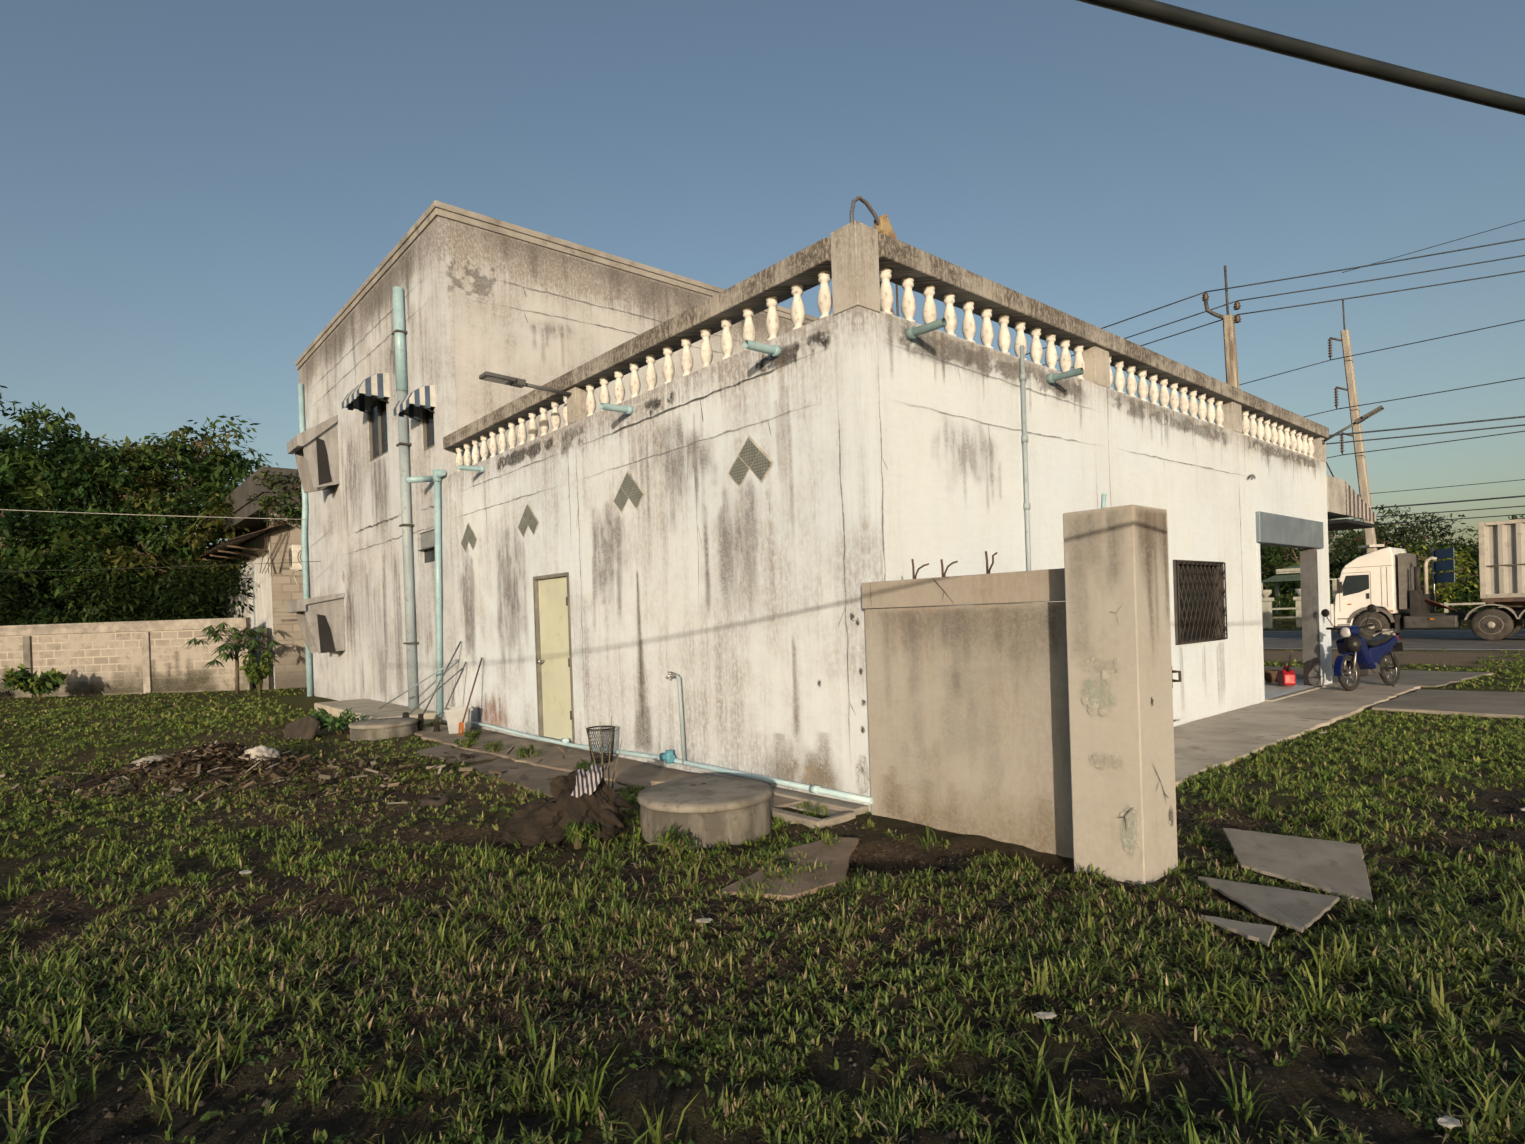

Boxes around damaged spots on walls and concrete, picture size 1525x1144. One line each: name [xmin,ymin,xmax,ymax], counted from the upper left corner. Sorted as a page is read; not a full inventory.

damp [1107,395,1224,441]
damp [946,439,993,473]
damp [1249,442,1315,466]
damp [776,756,834,789]